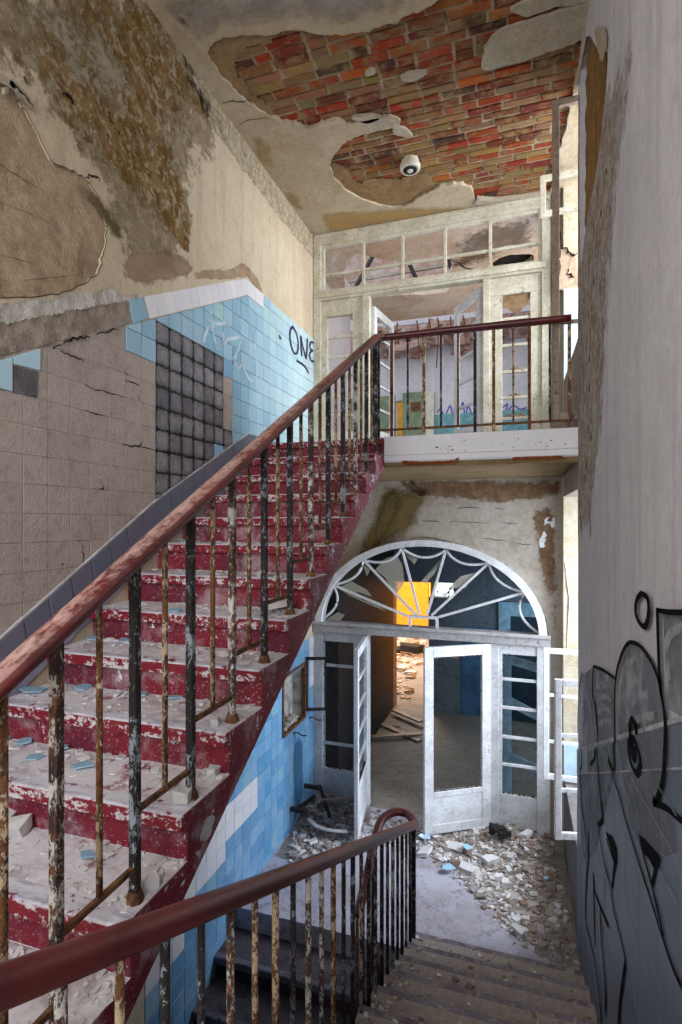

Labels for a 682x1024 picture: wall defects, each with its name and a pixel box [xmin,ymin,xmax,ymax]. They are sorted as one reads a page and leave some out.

spalling [0,72,108,298]
crack [53,328,140,417]
damp [0,0,222,258]
flaking render [0,300,232,636]
spalling [208,0,631,534]
damp [360,480,560,606]
peeling [539,517,555,548]